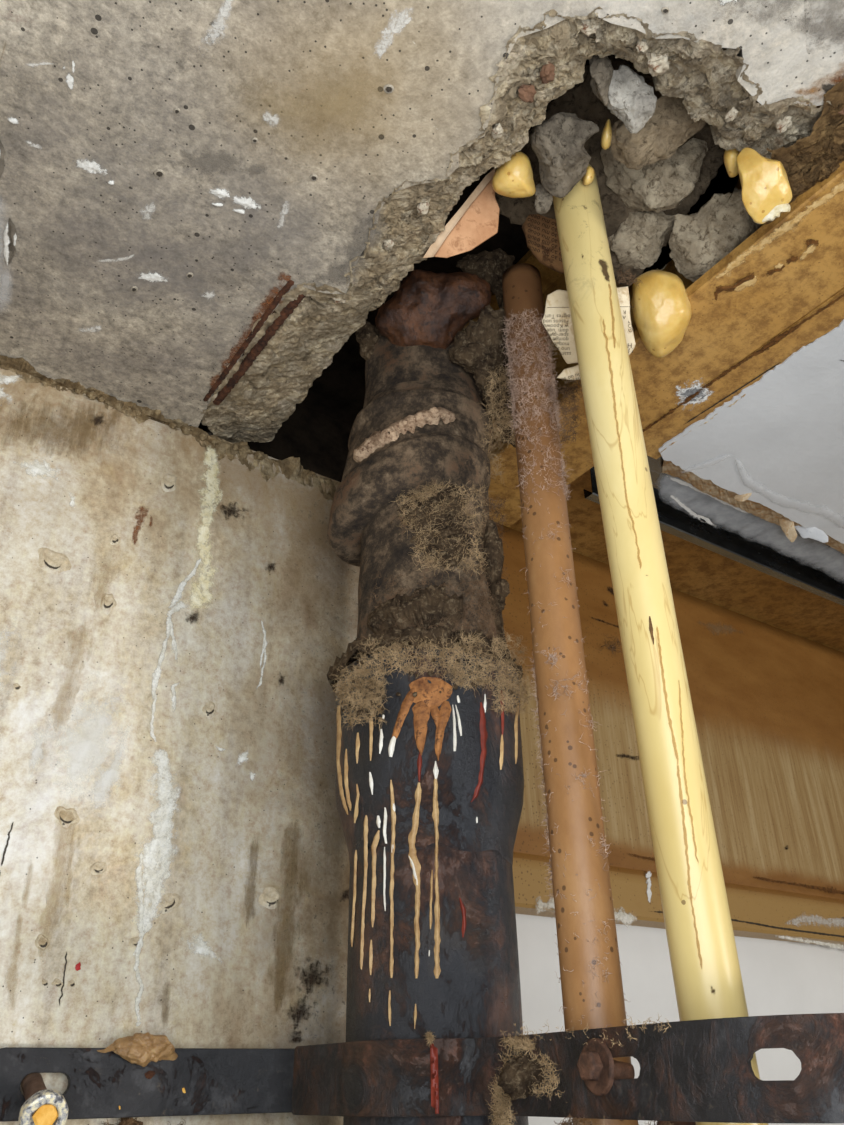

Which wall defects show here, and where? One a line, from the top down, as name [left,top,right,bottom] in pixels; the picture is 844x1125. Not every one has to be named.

rust [210,274,291,389]
spalling [200,6,844,443]
crack [0,823,13,873]
water stain [133,447,244,1026]